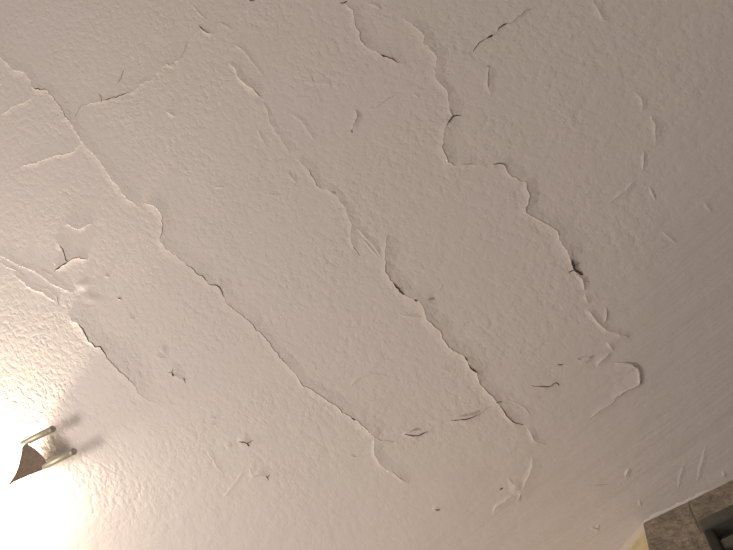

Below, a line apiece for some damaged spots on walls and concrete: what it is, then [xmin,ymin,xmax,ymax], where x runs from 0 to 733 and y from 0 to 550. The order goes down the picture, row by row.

peeling [401,14,590,291]
peeling [68,300,162,405]
peeling [378,234,547,445]
peeling [590,352,641,418]